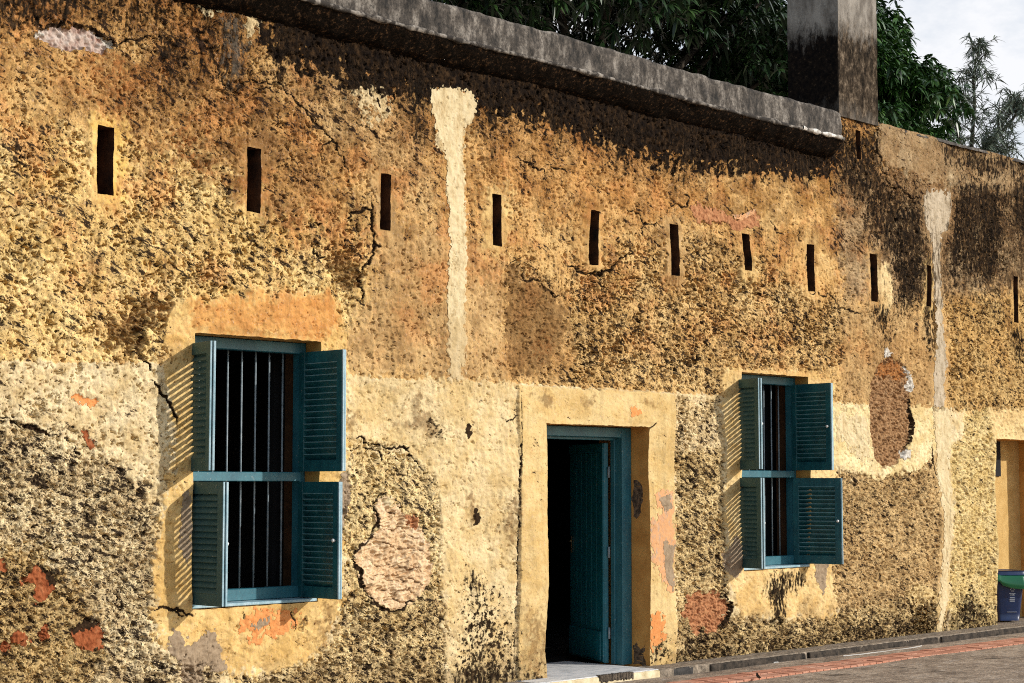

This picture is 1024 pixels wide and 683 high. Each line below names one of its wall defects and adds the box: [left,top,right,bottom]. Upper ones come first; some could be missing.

flaking render [35,21,113,55]
crack [192,29,382,299]
crack [132,321,178,426]
water stain [187,4,1024,672]
flaking render [869,347,915,469]
flaking render [19,562,56,605]
flaking render [68,619,104,652]
peeling [238,606,304,645]
flaking render [351,493,434,613]
peeling [650,611,667,653]
water stain [671,666,693,676]
peeling [631,480,734,636]